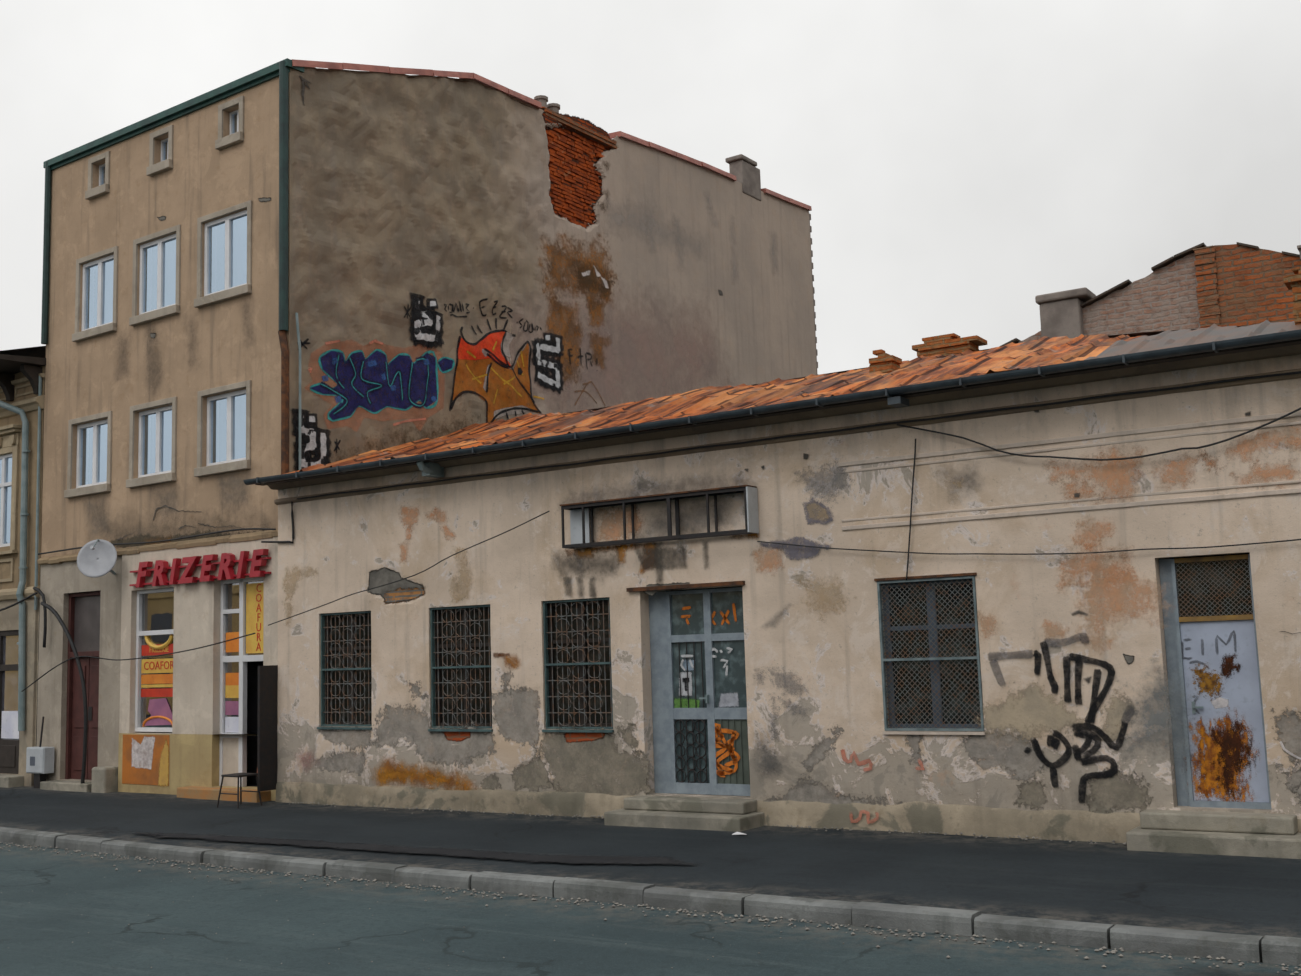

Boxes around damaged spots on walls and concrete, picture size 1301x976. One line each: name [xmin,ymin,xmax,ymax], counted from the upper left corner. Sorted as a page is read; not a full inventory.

flaking render [542,112,613,229]
flaking render [315,653,650,796]
flaking render [764,726,903,806]
flaking render [905,735,927,764]
flaking render [961,682,1136,810]
flaking render [1084,767,1154,814]
corrosion [1184,653,1259,802]
flaking render [1271,708,1301,803]